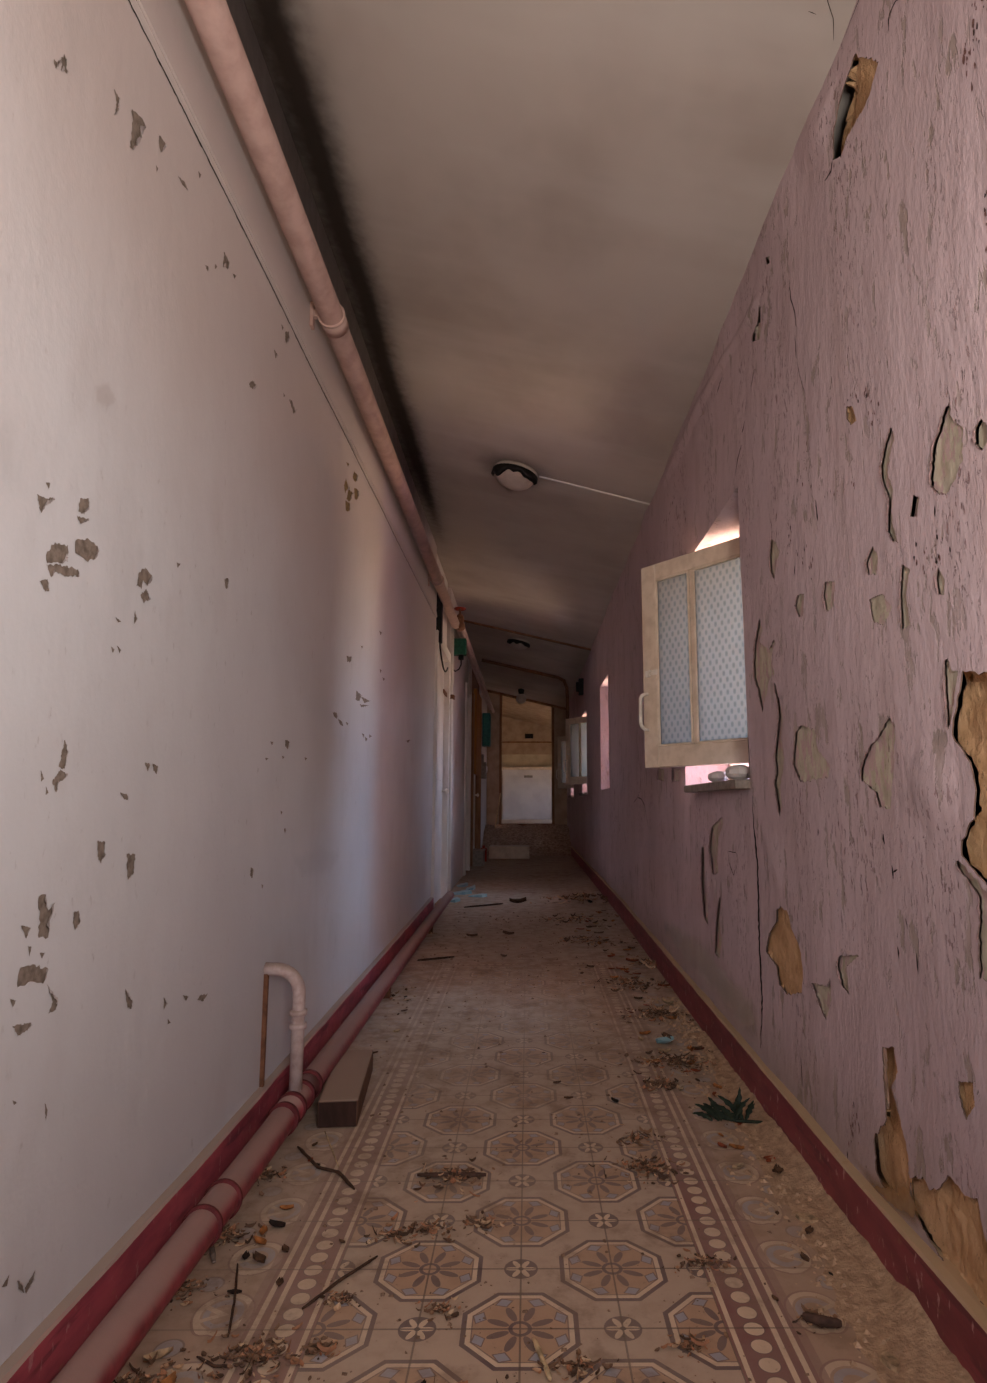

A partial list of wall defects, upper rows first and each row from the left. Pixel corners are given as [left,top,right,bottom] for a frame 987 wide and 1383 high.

crack [809,0,897,40]
flaking render [841,54,878,155]
peeling [37,482,55,513]
peeling [40,498,99,591]
flaking render [943,659,987,879]
peeling [10,894,58,1013]
flaking render [768,907,858,1017]
peeling [12,1022,32,1035]
flaking render [878,1047,987,1308]